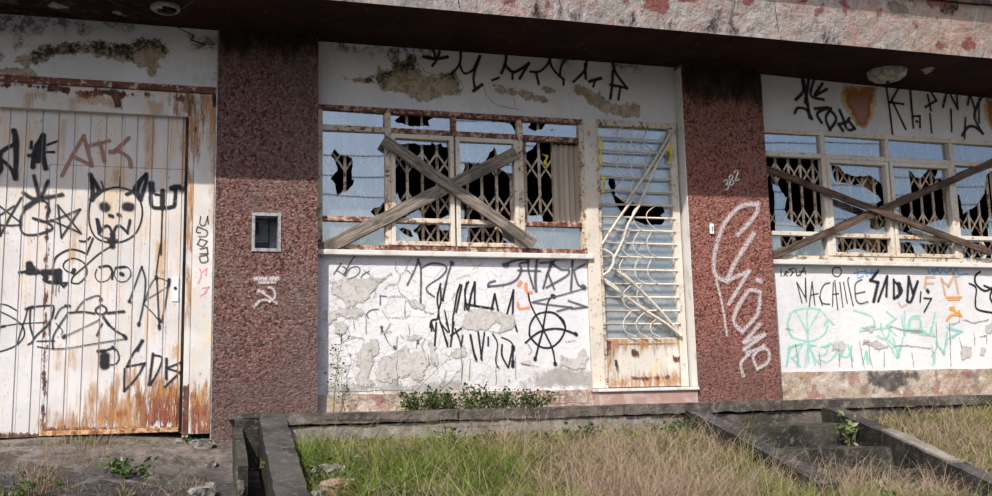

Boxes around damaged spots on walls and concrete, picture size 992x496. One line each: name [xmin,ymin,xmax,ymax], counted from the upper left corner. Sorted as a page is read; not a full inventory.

corrosion [0,82,159,114]
flaking render [0,40,169,77]
flaking render [344,53,461,102]
flaking render [493,83,555,103]
flaking render [574,84,641,118]
corrosion [172,93,216,252]
crack [327,257,470,394]
corrosion [0,291,210,438]
peeling [355,334,439,401]
crack [491,331,540,385]
corrosion [607,338,681,387]
crack [319,418,514,433]